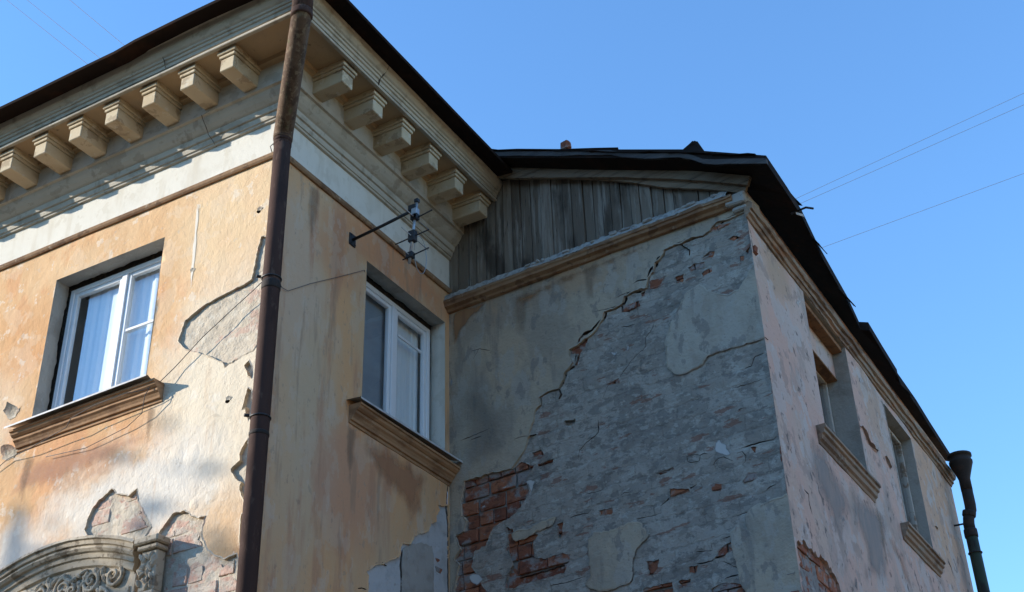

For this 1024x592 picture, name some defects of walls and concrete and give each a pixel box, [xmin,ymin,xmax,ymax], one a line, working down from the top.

flaking render [177,235,266,421]
crack [541,263,659,400]
flaking render [3,402,19,420]
flaking render [366,212,789,592]
flaking render [230,438,249,500]
flaking render [84,488,242,592]
flaking render [787,538,841,592]